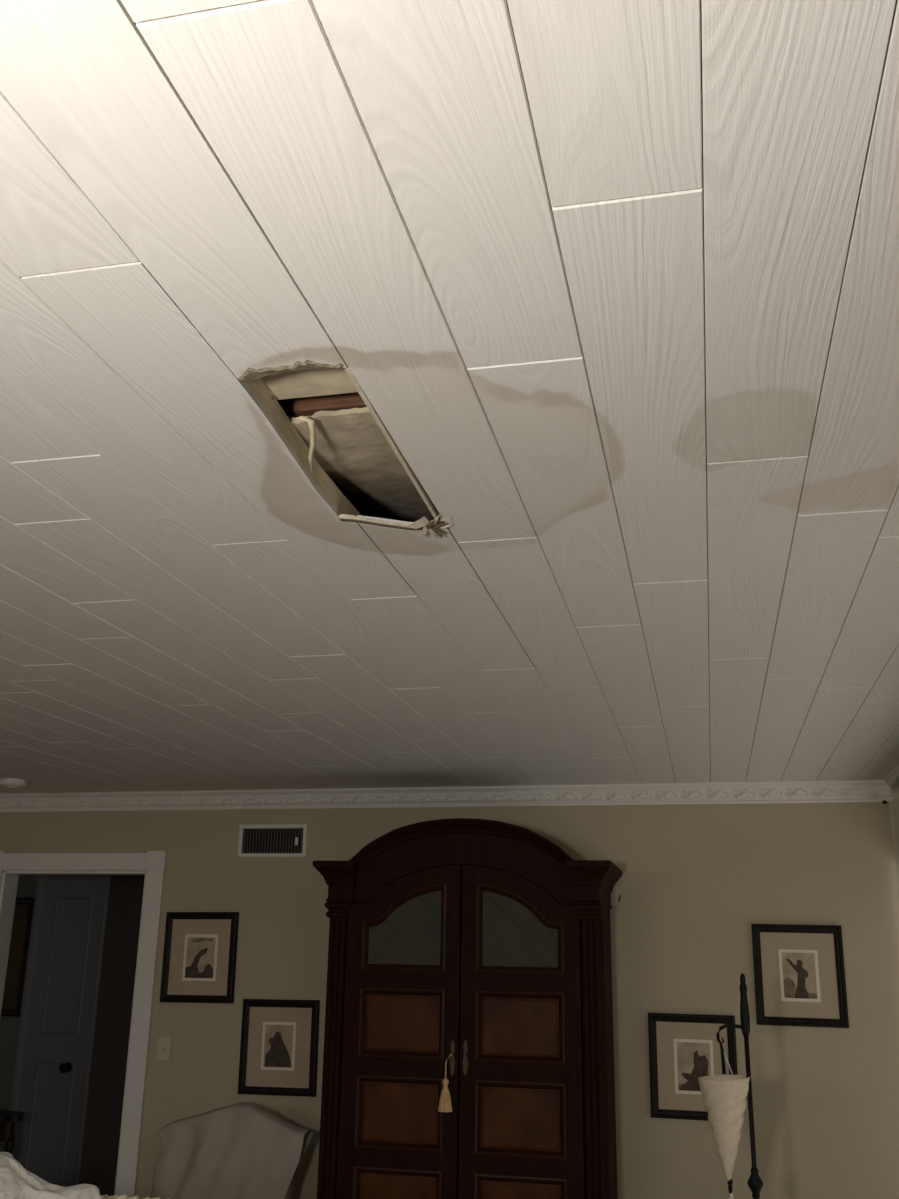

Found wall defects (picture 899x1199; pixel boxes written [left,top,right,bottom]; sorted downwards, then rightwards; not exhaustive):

spalling [335,483,403,521]